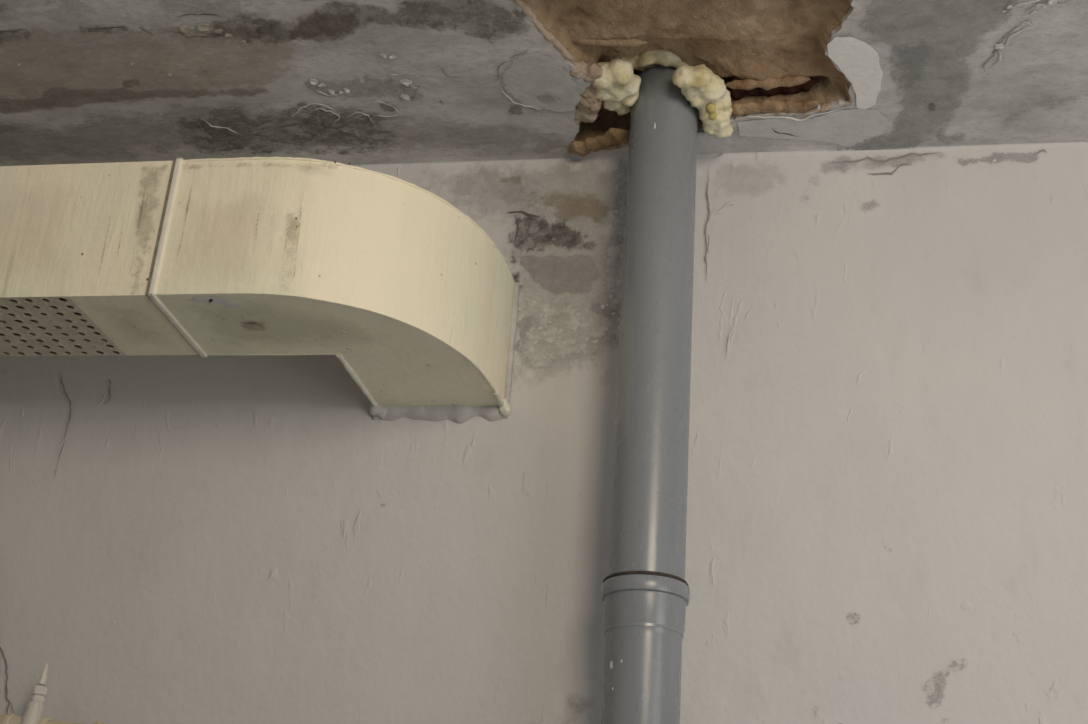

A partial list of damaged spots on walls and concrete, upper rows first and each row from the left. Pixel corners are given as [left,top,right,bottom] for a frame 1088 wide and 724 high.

damp [211,0,526,44]
damp [0,80,565,157]
peeling [305,74,423,112]
spalling [511,0,647,125]
spalling [725,76,810,90]
damp [825,0,1019,175]
damp [959,149,1047,165]
damp [507,211,592,281]
crack [53,372,71,478]
crack [0,643,14,715]